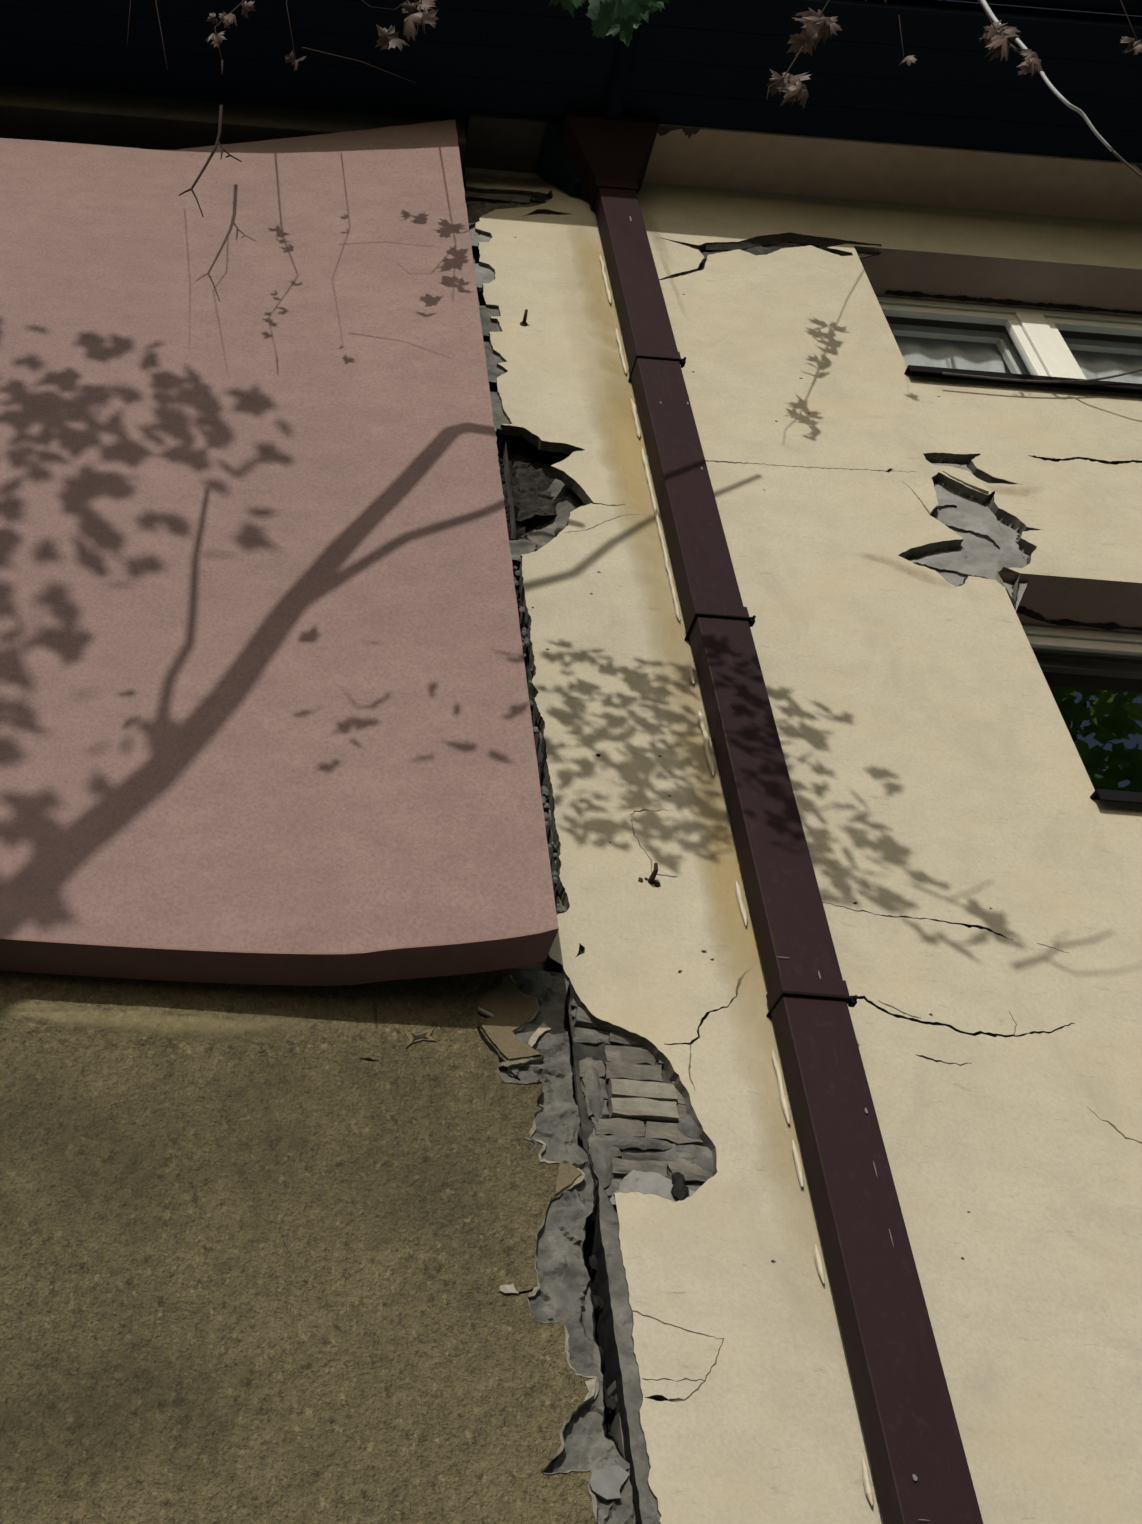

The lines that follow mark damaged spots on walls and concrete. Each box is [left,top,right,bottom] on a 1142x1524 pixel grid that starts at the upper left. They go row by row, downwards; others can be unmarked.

crack [659,232,1142,316]
flaking render [464,186,593,563]
crack [1028,455,1142,465]
flaking render [885,452,1040,611]
crack [630,810,678,878]
crack [823,902,1068,953]
crack [858,996,1075,1066]
crack [1087,1107,1142,1144]
flaking render [478,943,717,1524]